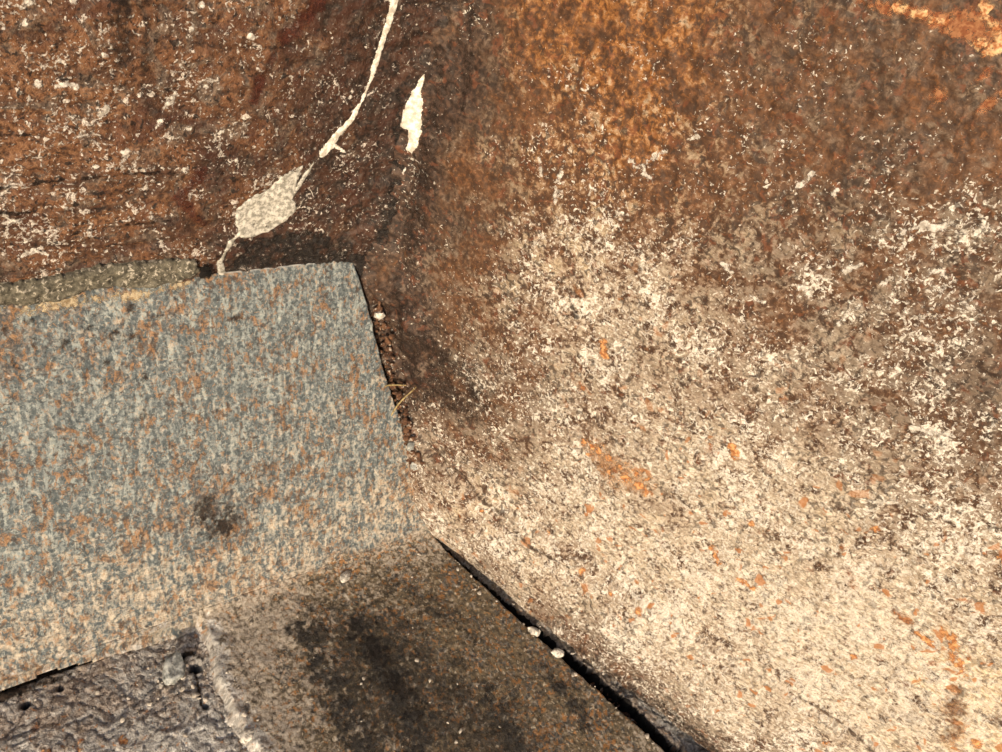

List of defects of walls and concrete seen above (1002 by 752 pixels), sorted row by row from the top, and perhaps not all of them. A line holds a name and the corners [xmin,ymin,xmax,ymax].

rust [856,0,1002,81]
peeling [54,82,79,90]
peeling [155,91,177,128]
rust [173,167,206,222]
rust [599,339,610,359]
crack [439,542,681,752]
water stain [285,621,379,752]